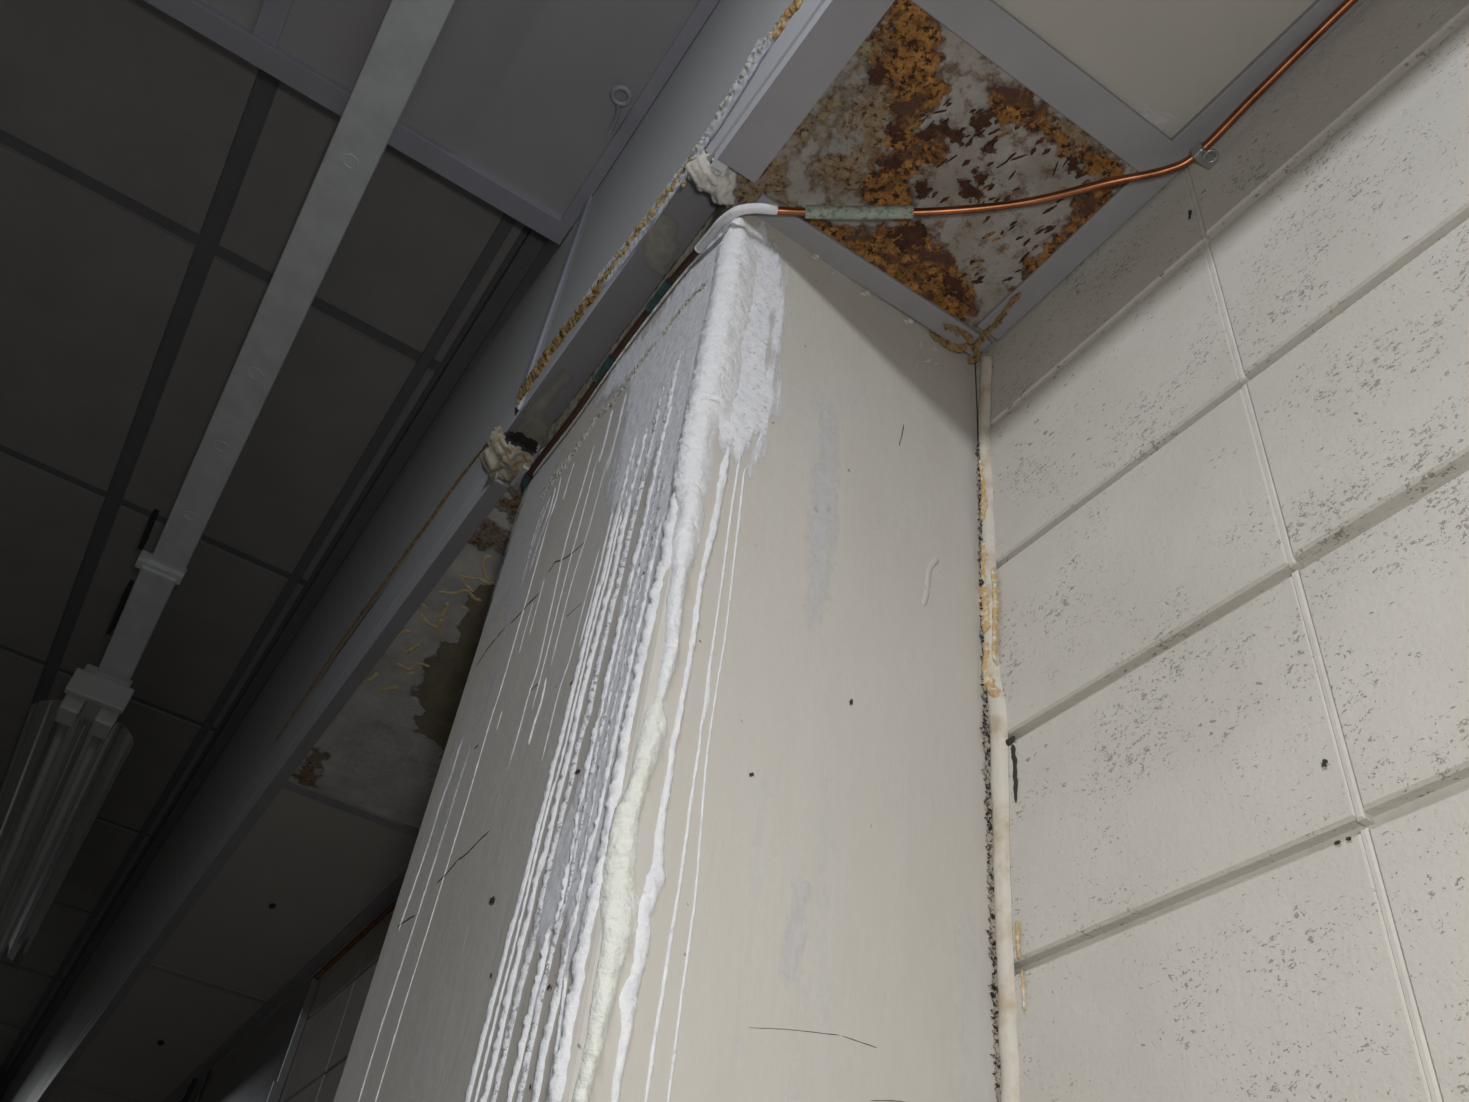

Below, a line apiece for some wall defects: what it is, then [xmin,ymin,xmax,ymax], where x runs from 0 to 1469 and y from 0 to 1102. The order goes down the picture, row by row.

corrosion [733,0,1125,365]
crack [437,830,490,883]